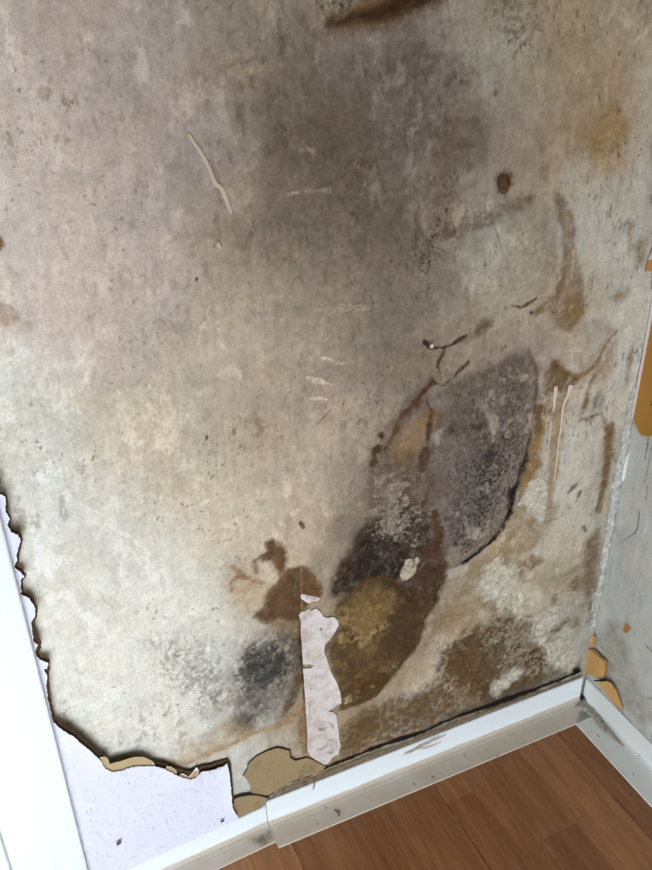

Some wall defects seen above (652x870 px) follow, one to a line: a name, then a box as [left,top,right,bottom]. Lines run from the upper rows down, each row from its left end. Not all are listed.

rust [328,0,442,27]
damp [534,194,584,330]
damp [165,333,616,766]
flaking render [590,385,637,640]
crack [267,667,581,797]